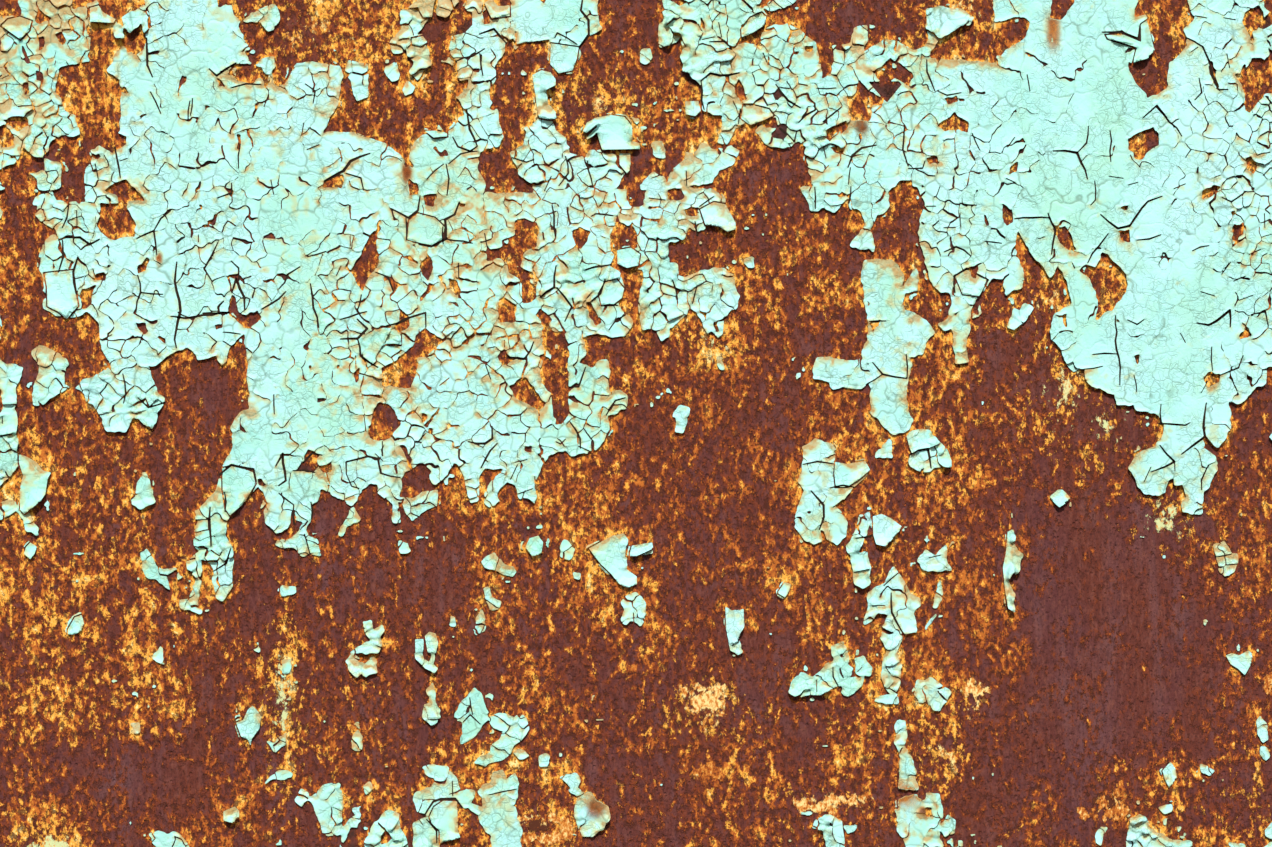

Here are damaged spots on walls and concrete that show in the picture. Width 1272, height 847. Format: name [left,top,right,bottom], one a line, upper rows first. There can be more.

crack [391,110,488,283]
crack [135,211,427,368]
peeling [0,0,1272,626]
crack [1083,245,1268,490]
crack [196,441,400,571]
peeling [346,620,385,677]
peeling [295,632,550,847]
rust [679,682,727,737]
rust [793,792,874,816]
peeling [789,438,952,704]
rust [960,678,991,720]
rust [1147,497,1181,538]